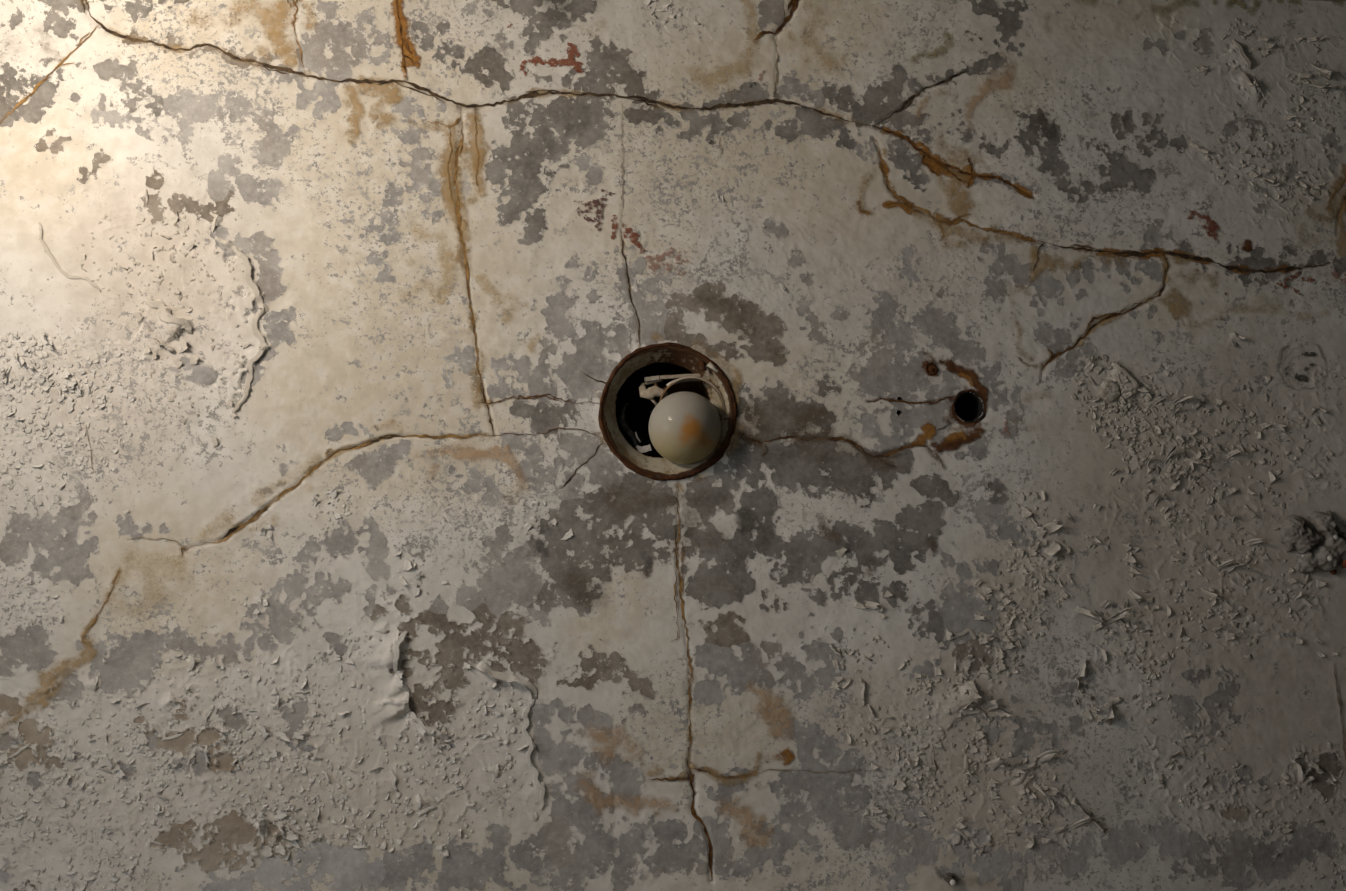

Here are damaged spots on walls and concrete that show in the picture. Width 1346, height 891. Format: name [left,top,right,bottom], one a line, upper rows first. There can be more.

flaking render [37,0,394,120]
damp [230,0,316,66]
flaking render [339,87,451,284]
damp [434,114,489,303]
flaking render [411,0,1346,245]
rust [916,142,975,187]
flaking render [0,57,300,677]
crack [0,0,1346,647]
rust [911,352,988,453]
flaking render [0,217,1346,891]
crack [649,482,871,881]
crack [1334,668,1346,762]